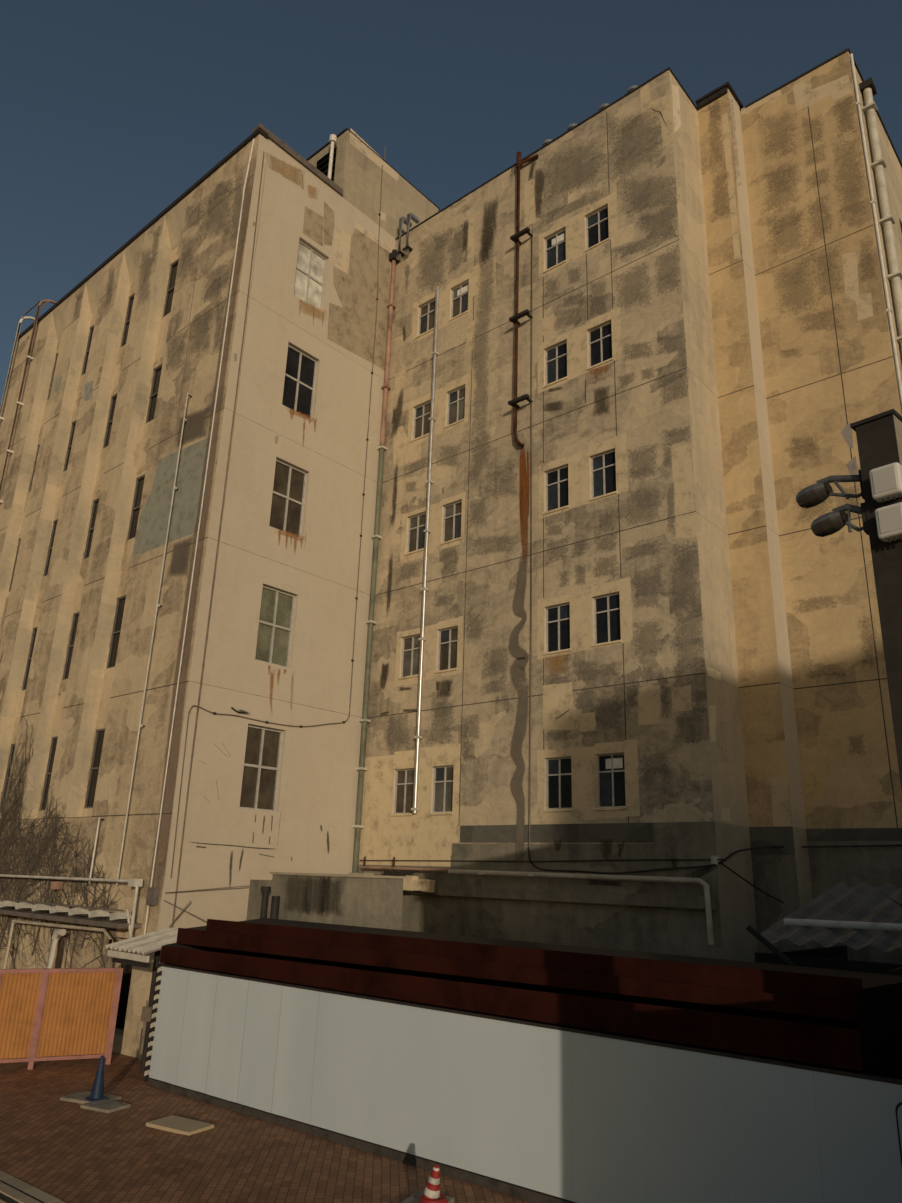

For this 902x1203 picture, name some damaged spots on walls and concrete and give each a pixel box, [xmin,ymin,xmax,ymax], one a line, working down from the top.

leakage [509,561,529,853]